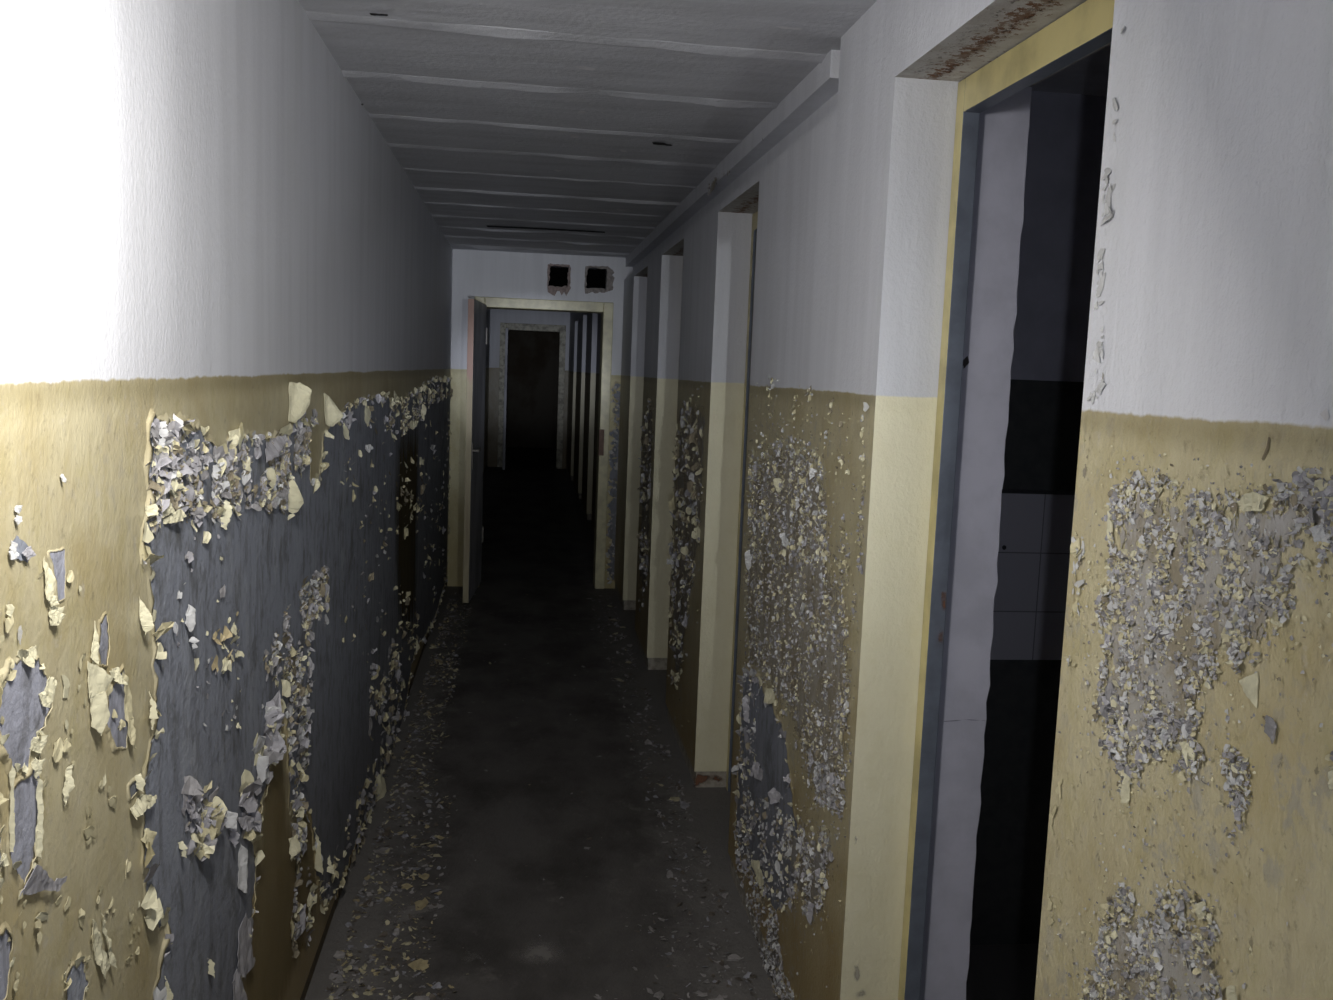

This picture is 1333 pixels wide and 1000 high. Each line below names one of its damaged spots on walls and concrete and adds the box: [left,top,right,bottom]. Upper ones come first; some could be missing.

peeling [9,505,66,626]
peeling [0,604,75,897]
peeling [87,375,453,1000]
peeling [731,665,802,915]
peeling [0,921,16,1000]
peeling [61,910,117,1000]